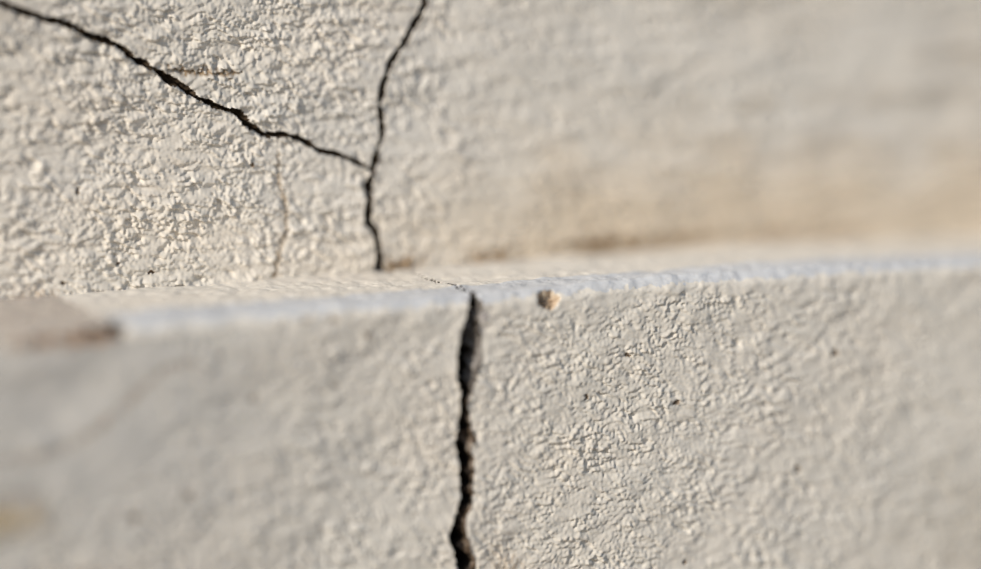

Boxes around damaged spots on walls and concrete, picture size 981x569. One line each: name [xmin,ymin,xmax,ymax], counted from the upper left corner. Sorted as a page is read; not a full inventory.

crack [0,0,483,569]